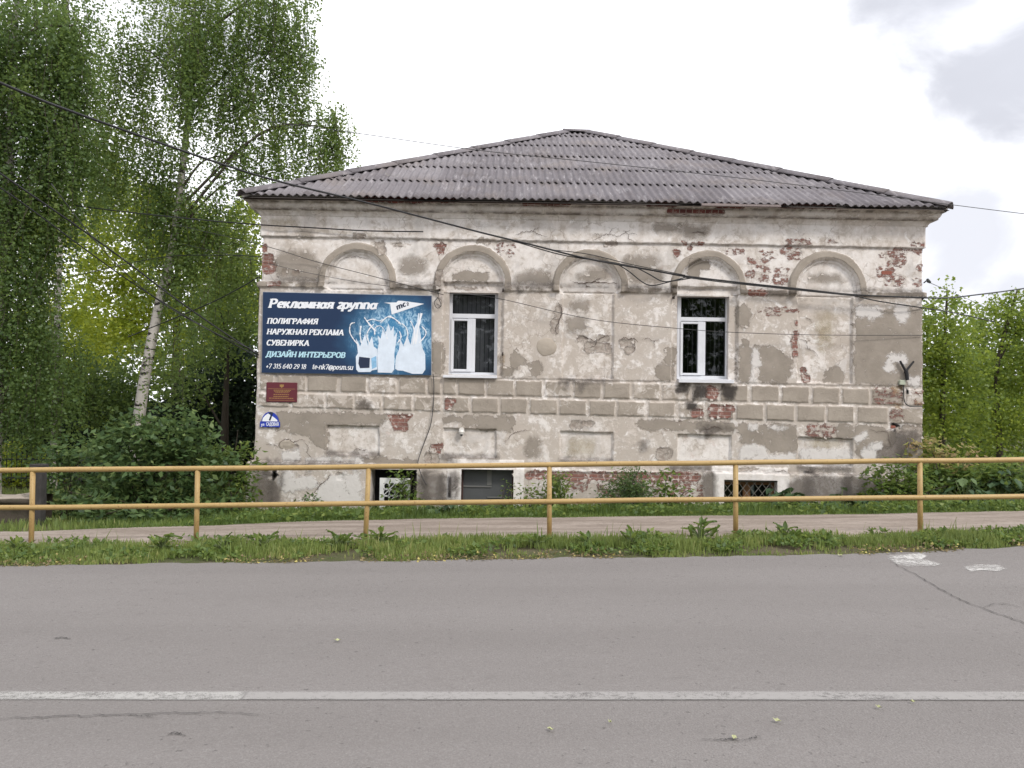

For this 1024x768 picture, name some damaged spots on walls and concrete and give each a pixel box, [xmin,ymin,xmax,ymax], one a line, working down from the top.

peeling [262,243,321,287]
peeling [353,233,490,291]
flaking render [550,301,635,355]
peeling [635,238,925,459]
peeling [275,410,413,475]
flaking render [525,438,704,504]